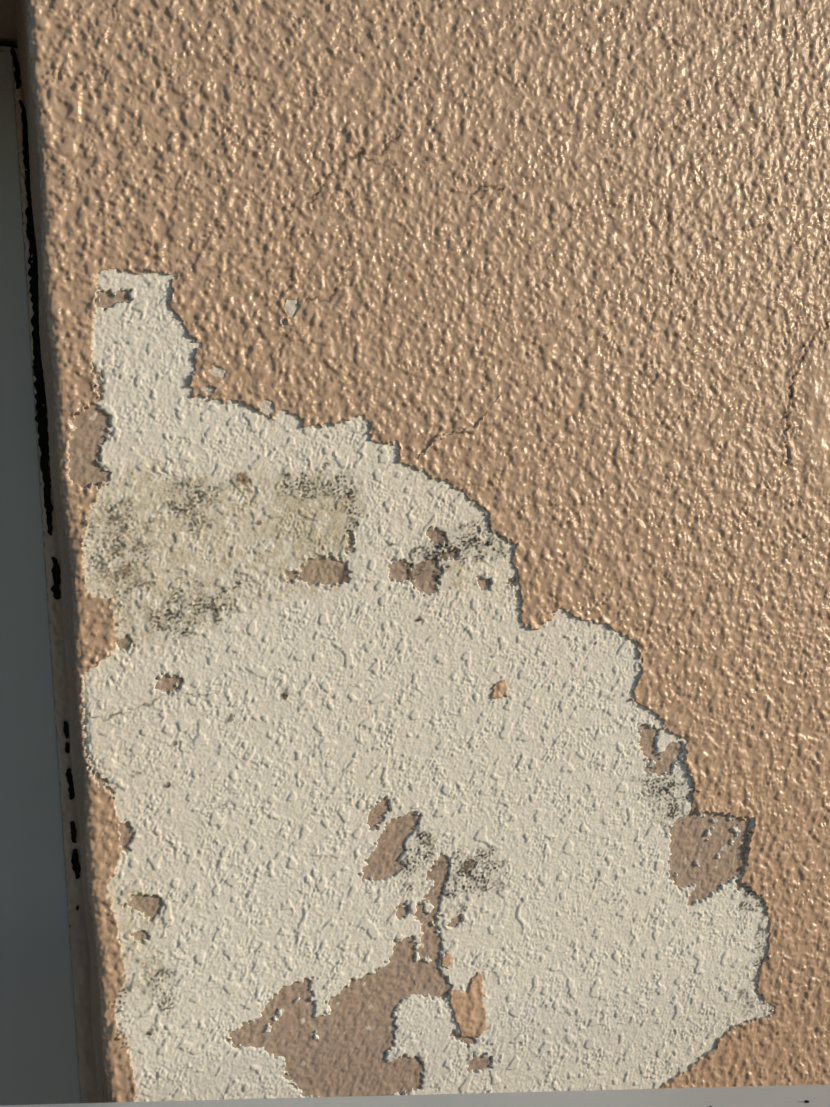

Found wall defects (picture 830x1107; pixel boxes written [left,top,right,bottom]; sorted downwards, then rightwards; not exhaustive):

crack [779,321,830,462]
damp [167,478,222,531]
damp [277,463,360,532]
damp [81,499,150,619]
damp [407,521,506,581]
damp [150,581,241,636]
peeling [68,269,774,1102]